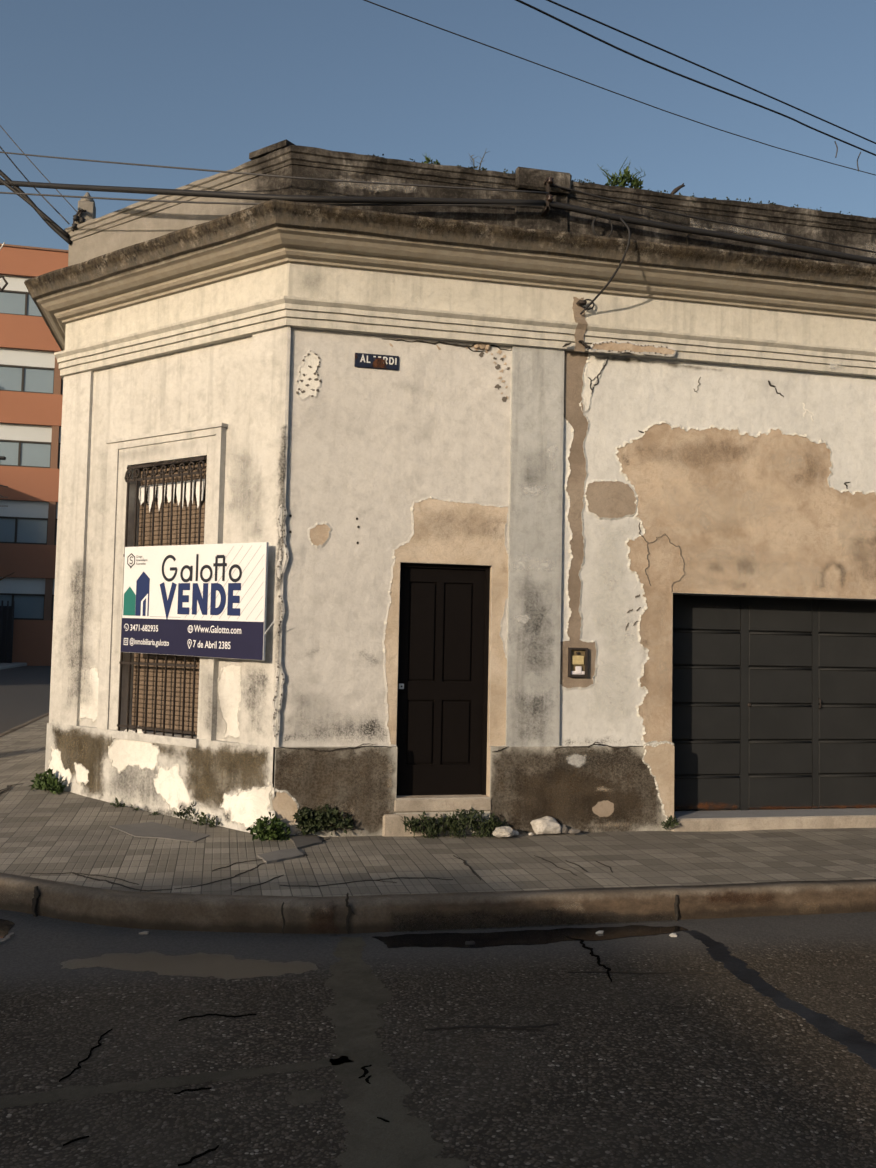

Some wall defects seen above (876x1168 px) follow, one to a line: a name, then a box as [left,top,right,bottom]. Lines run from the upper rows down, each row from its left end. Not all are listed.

peeling [296,350,322,401]
peeling [307,521,333,549]
spalling [560,340,677,690]
peeling [601,420,876,823]
water stain [55,729,115,793]
water stain [129,720,395,833]
water stain [490,741,662,834]
crack [179,1013,256,1021]
crack [59,1029,113,1082]
crack [178,1145,219,1166]